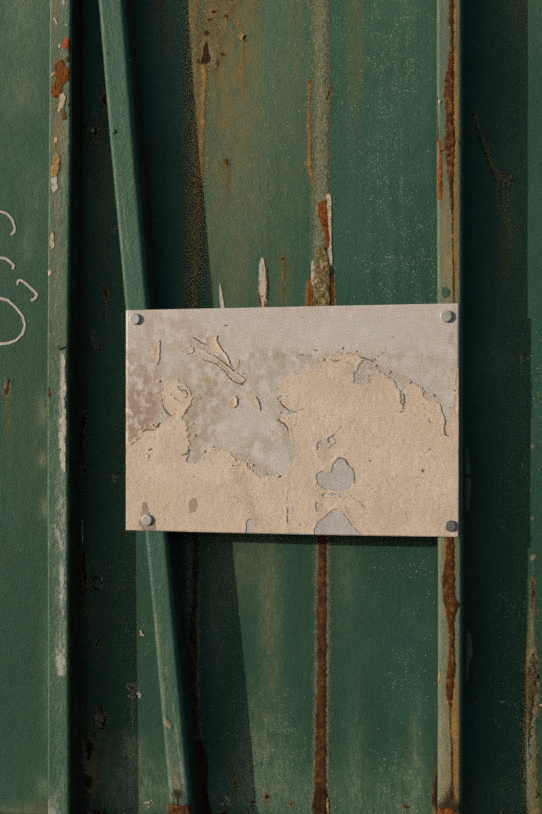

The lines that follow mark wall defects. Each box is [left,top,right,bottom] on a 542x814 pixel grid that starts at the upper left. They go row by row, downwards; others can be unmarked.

rust [50,56,70,120]
peeling [183,335,246,385]
rust [187,0,244,309]
peeling [126,347,459,537]
peeling [306,194,336,306]
rust [437,0,461,303]
rust [167,532,226,814]
rust [312,535,329,814]
rust [431,537,461,814]
rust [522,578,541,814]